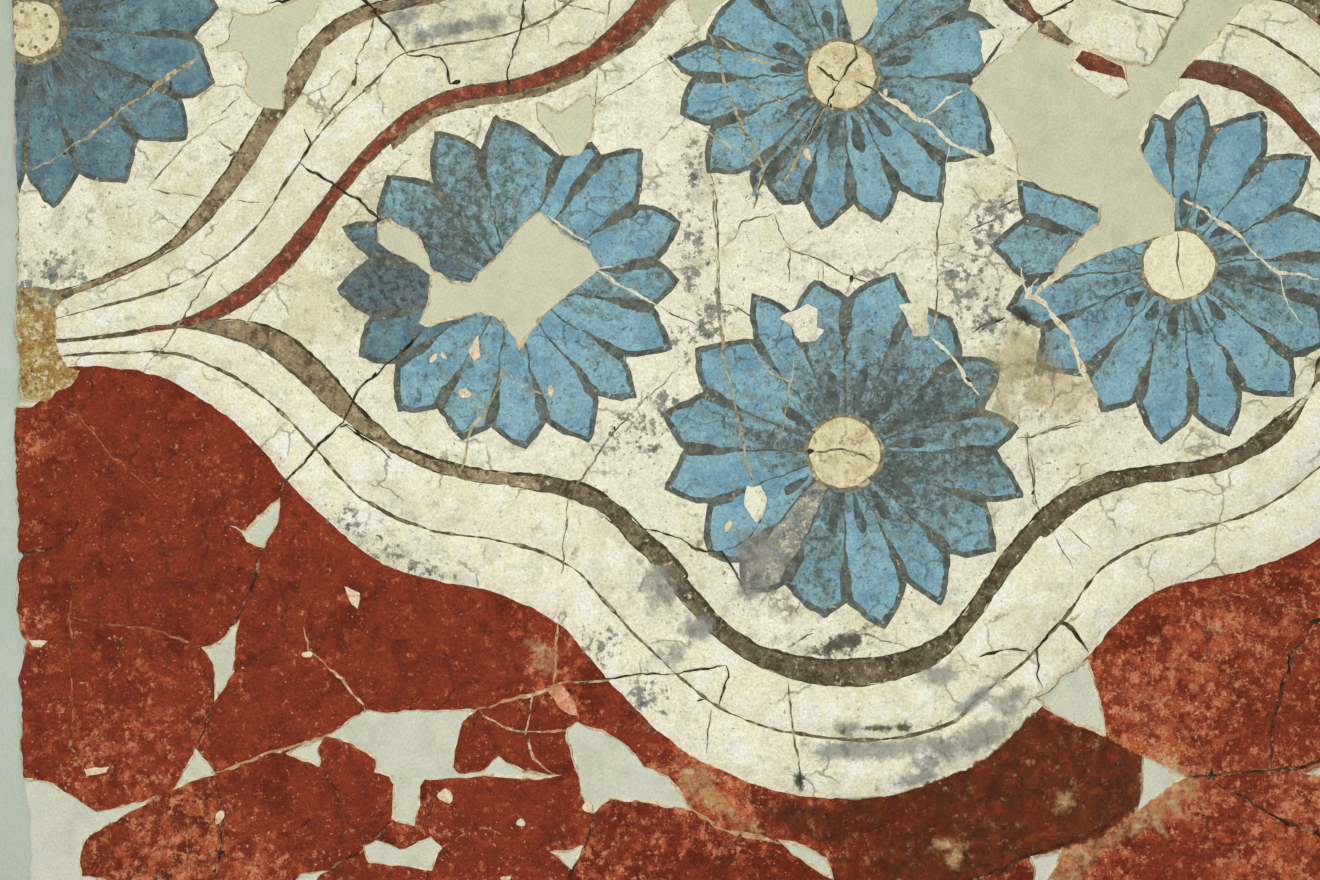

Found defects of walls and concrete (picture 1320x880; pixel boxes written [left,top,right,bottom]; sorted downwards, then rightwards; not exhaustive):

crack [298,0,461,222]
flaking render [969,0,1254,278]
flaking render [377,211,600,350]
crack [545,32,1026,485]
flaking render [13,89,156,880]
crack [274,331,422,502]
crack [973,268,1099,569]
flaking render [286,709,559,826]
crack [477,624,730,775]
flaking render [548,685,762,833]
crack [979,620,1089,687]
flaking render [363,837,442,871]